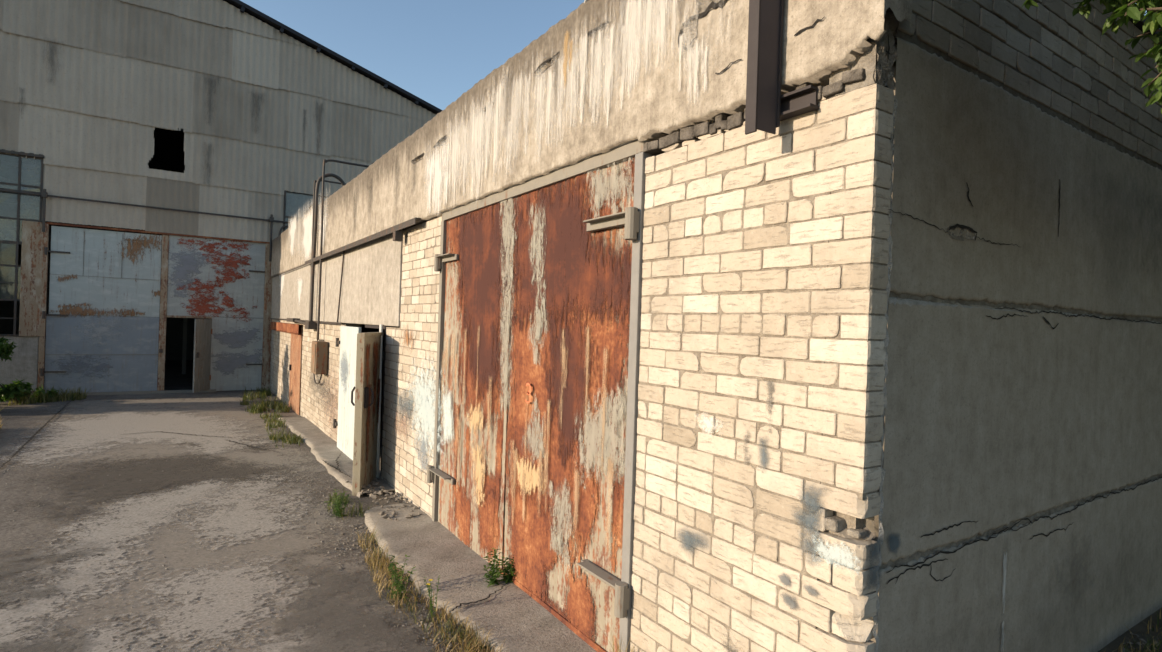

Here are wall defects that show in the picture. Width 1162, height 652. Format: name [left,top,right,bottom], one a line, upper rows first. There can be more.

spalling [678,0,727,51]
leakage [427,0,707,213]
crack [889,209,948,233]
crack [987,307,1161,329]
rust [441,157,635,646]
spalling [824,515,876,540]
crack [886,477,1162,584]